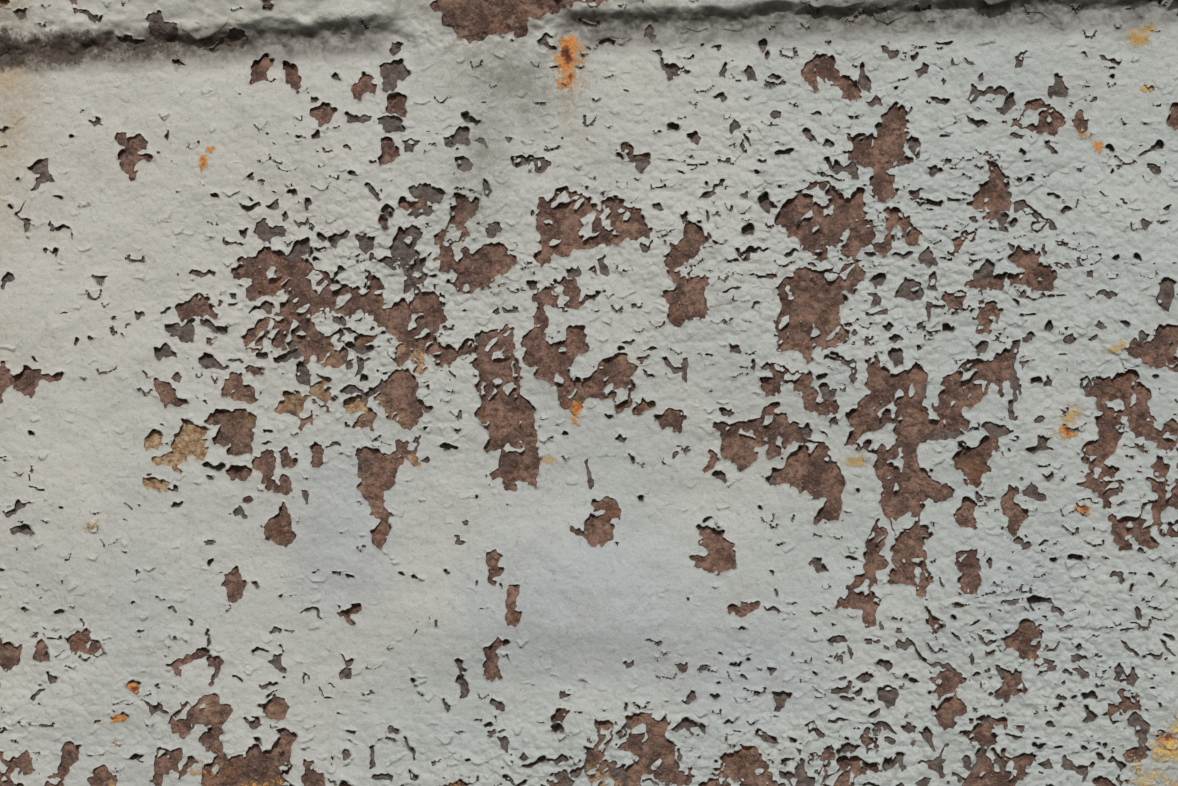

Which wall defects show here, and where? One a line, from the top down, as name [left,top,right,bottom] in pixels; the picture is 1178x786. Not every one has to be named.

peeling [112,7,253,58]
peeling [424,0,644,70]
rust [551,34,590,91]
peeling [953,47,1097,162]
peeling [80,109,172,184]
peeling [505,136,554,177]
peeling [0,356,85,406]
peeling [204,540,260,617]
peeling [567,490,625,552]
peeling [684,516,740,588]
peeling [0,596,392,786]
rust [1121,712,1178,786]